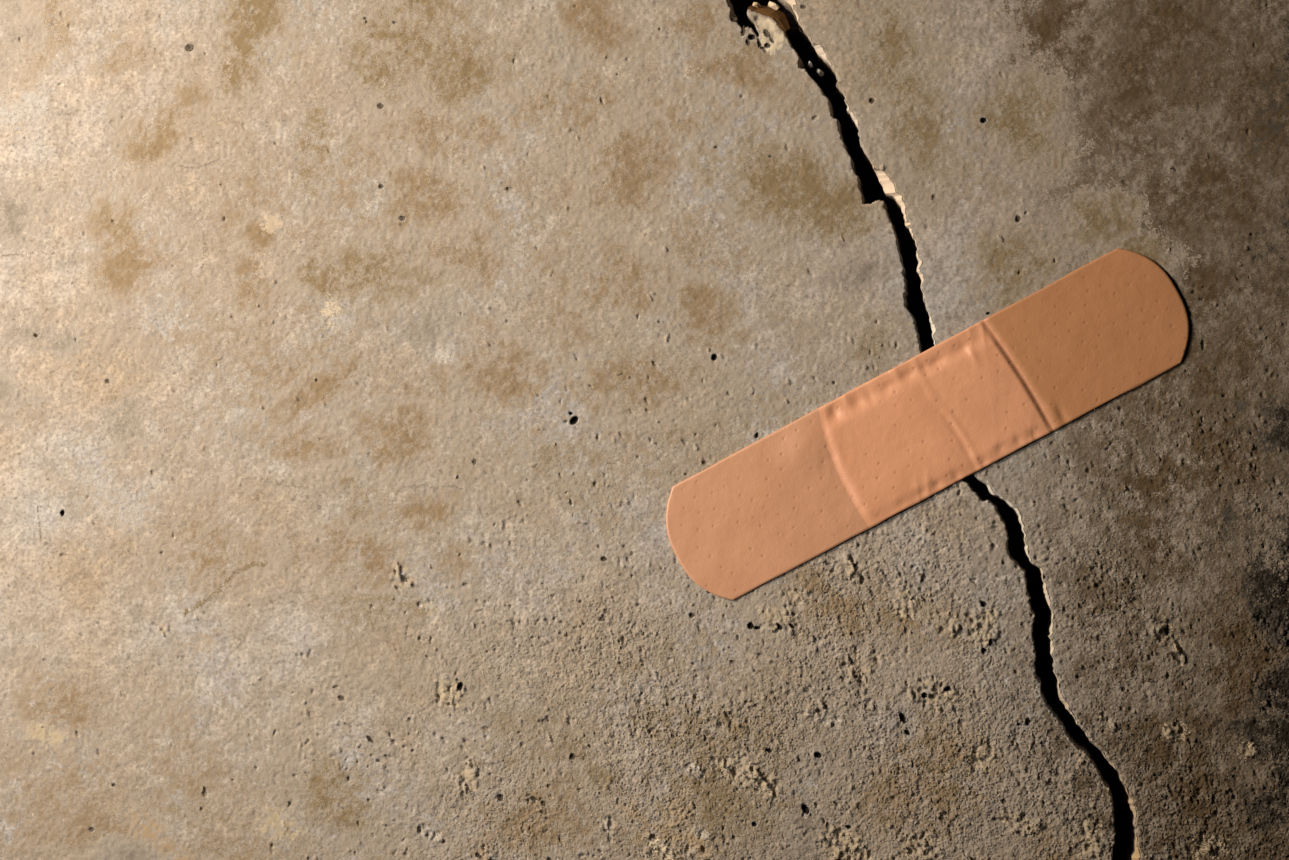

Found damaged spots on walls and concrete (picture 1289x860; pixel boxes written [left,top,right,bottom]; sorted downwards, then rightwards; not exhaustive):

crack [730,0,933,352]
crack [963,474,1131,860]